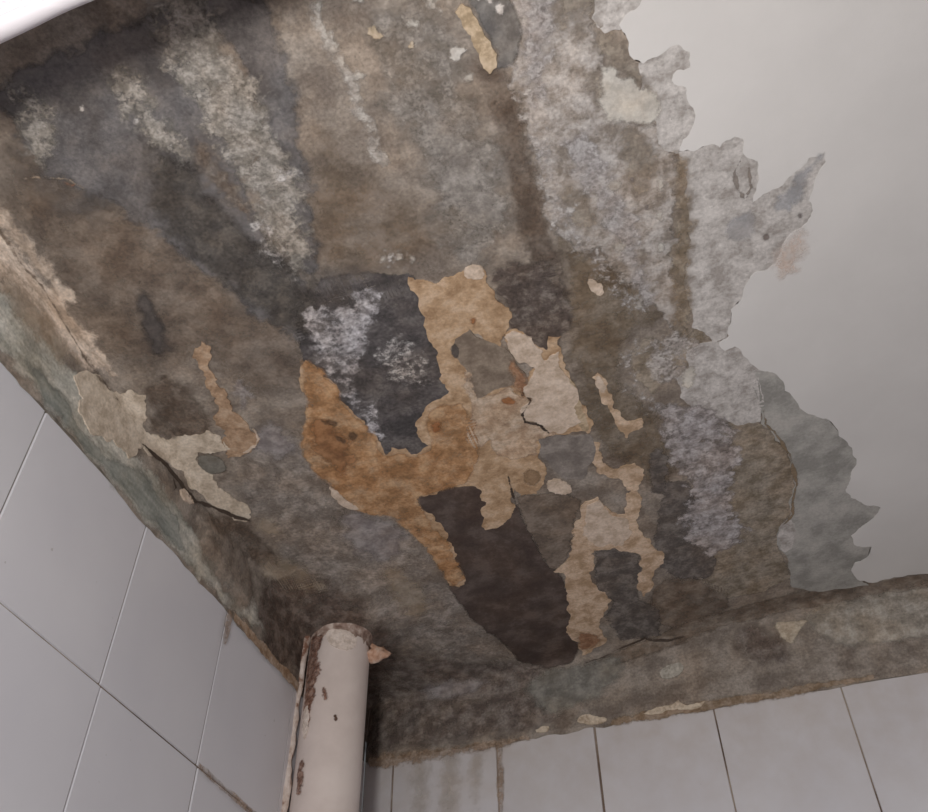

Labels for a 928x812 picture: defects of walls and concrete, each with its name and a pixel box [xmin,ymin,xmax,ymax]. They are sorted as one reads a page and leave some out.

peeling [0,0,195,91]
damp [202,0,431,274]
damp [369,0,513,262]
crack [0,229,118,400]
peeling [0,350,267,643]
damp [144,377,208,436]
crack [142,444,250,521]
damp [310,270,379,374]
peeling [61,0,880,687]
rust [224,609,357,739]
peeling [365,601,928,765]
rust [296,760,304,795]